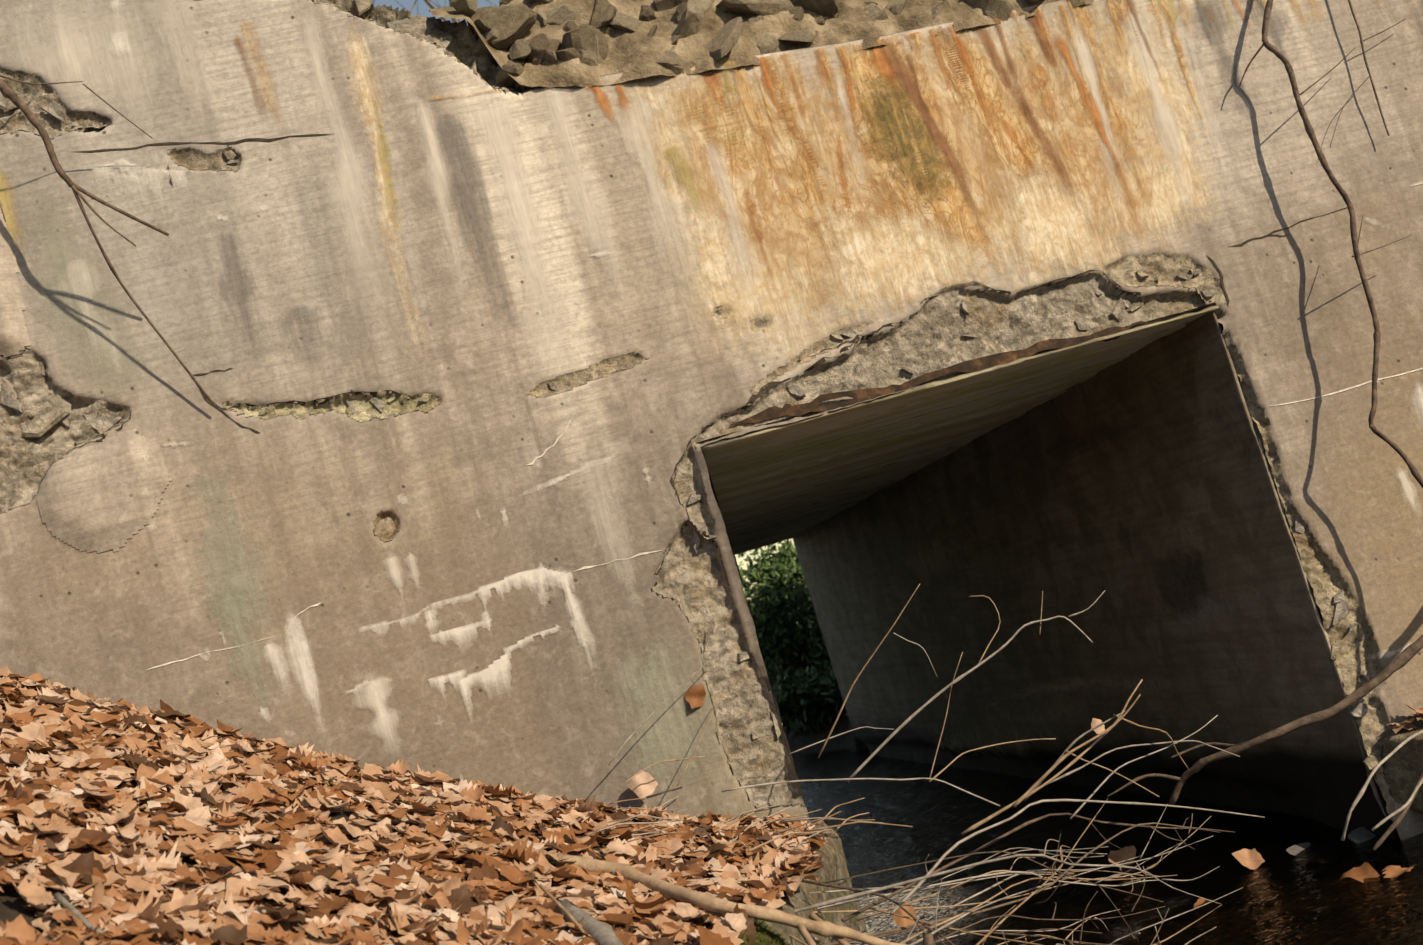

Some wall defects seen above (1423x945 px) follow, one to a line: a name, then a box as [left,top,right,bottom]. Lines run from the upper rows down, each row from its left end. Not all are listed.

corrosion [1108,0,1151,53]
spalling [0,66,112,139]
spalling [167,145,242,172]
corrosion [588,55,848,210]
corrosion [816,2,1125,256]
spalling [527,352,650,398]
spalling [0,350,130,514]
spalling [652,252,1403,823]
water stain [427,611,489,639]
water stain [462,568,586,634]
water stain [428,626,558,699]
water stain [355,680,392,736]